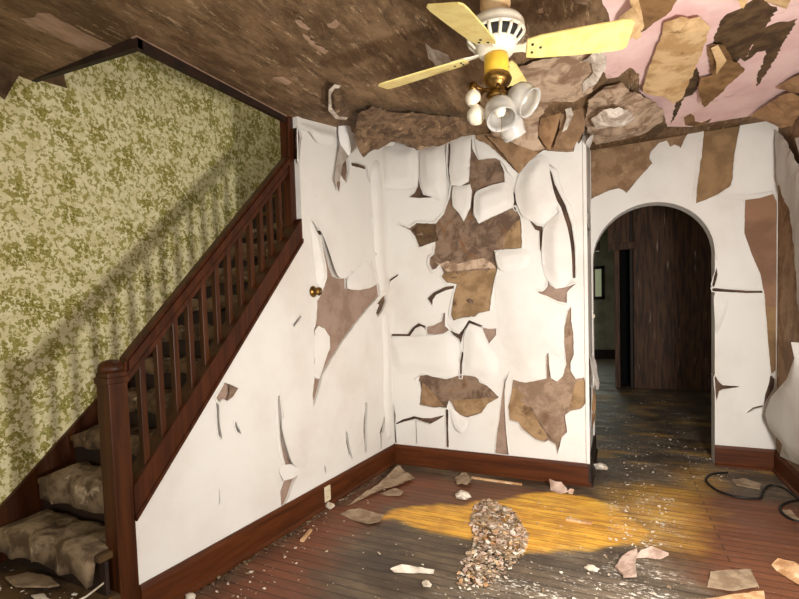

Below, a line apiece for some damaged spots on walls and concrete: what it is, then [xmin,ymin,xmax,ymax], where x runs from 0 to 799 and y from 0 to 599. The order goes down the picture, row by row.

peeling [312,237,387,406]
peeling [397,133,524,344]
peeling [413,280,596,456]
peeling [531,120,584,160]
peeling [587,0,797,407]